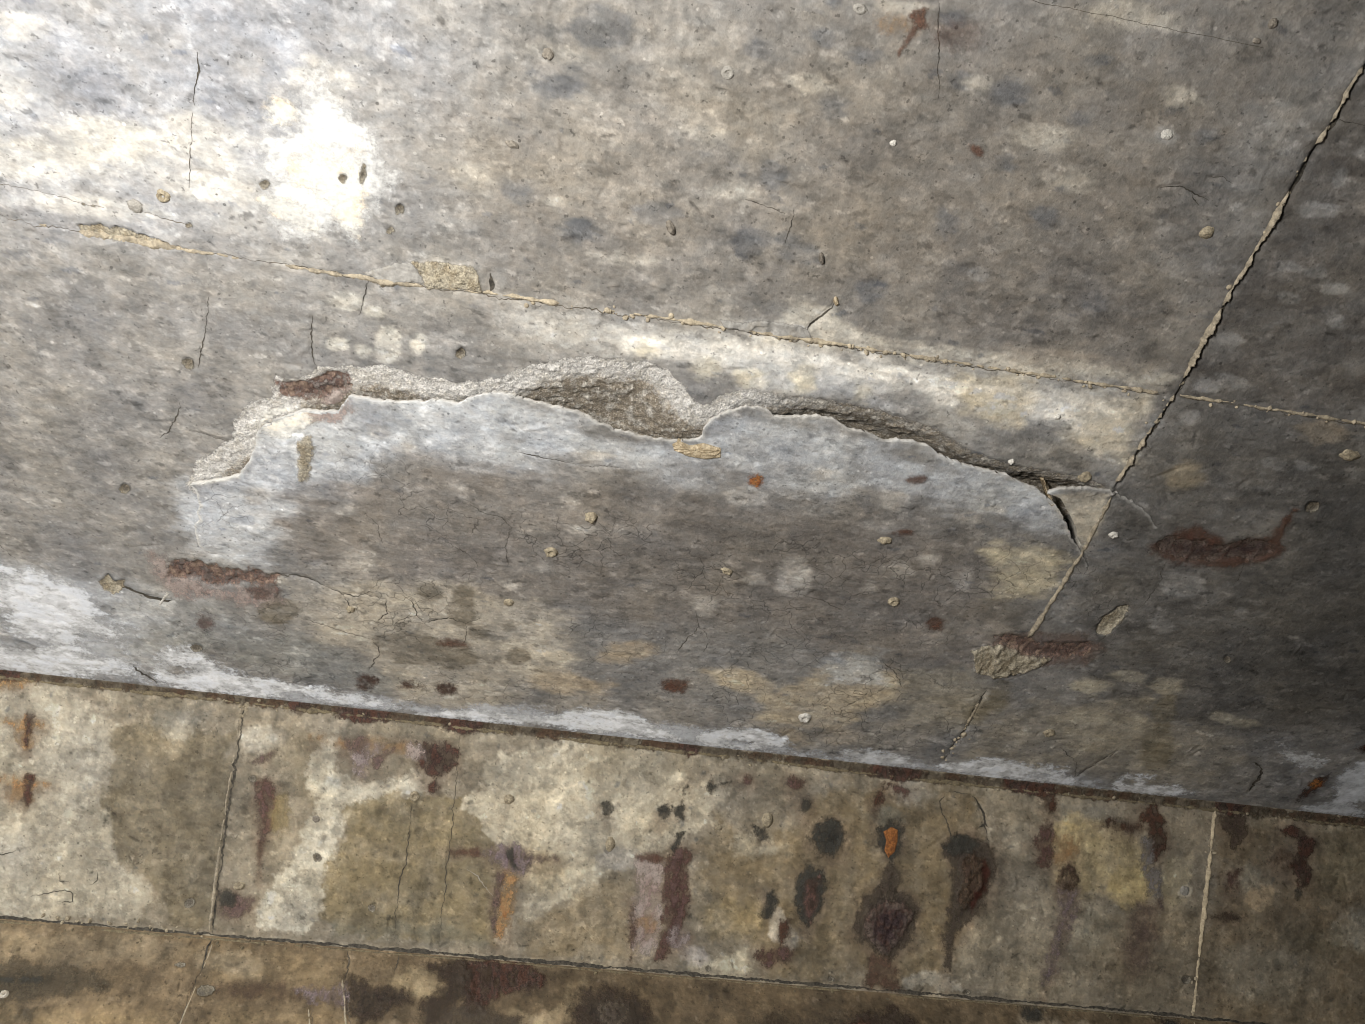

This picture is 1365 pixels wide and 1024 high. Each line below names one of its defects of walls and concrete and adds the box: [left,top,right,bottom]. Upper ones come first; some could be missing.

crack [1161,176,1230,205]
spalling [185,356,1158,646]
leakage [0,565,815,757]
leakage [843,748,1095,786]
leakage [1112,774,1187,796]
crack [1249,762,1263,791]
leakage [1303,761,1365,818]
corrosion [629,847,692,962]
corrosion [753,864,828,969]
corrosion [842,818,921,1024]
corrosion [941,832,997,972]
leakage [0,956,111,1024]